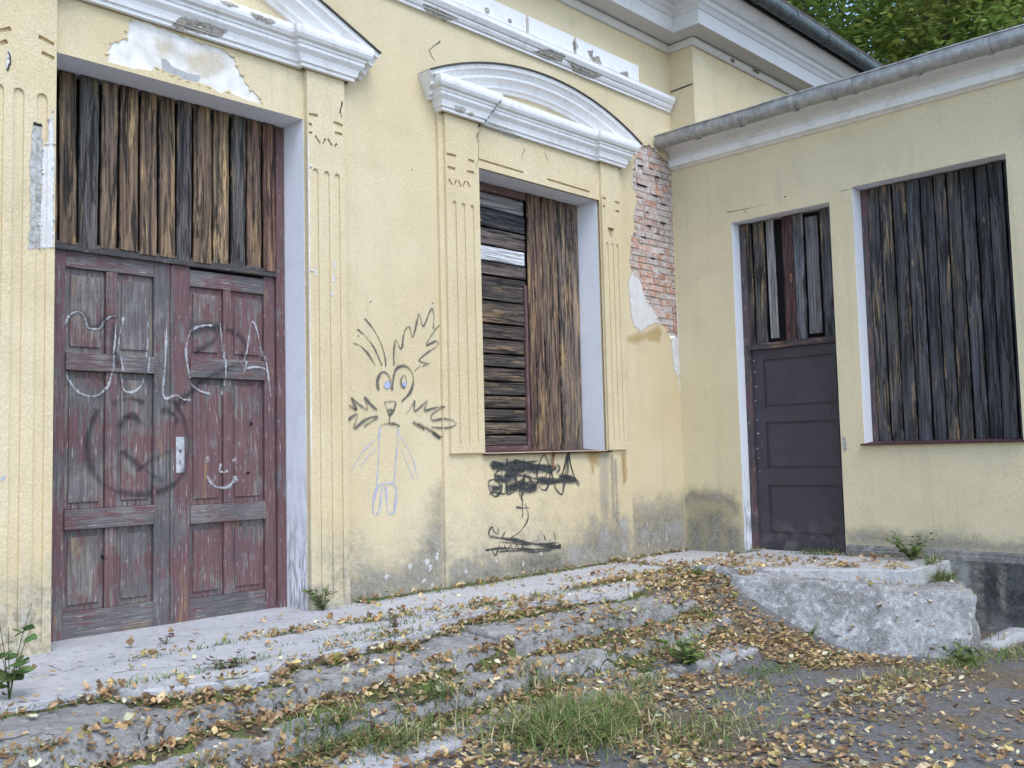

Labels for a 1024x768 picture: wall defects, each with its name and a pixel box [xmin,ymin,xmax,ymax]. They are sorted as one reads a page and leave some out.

flaking render [105,17,262,104]
flaking render [28,110,56,250]
flaking render [628,143,680,390]
water stain [353,456,737,596]